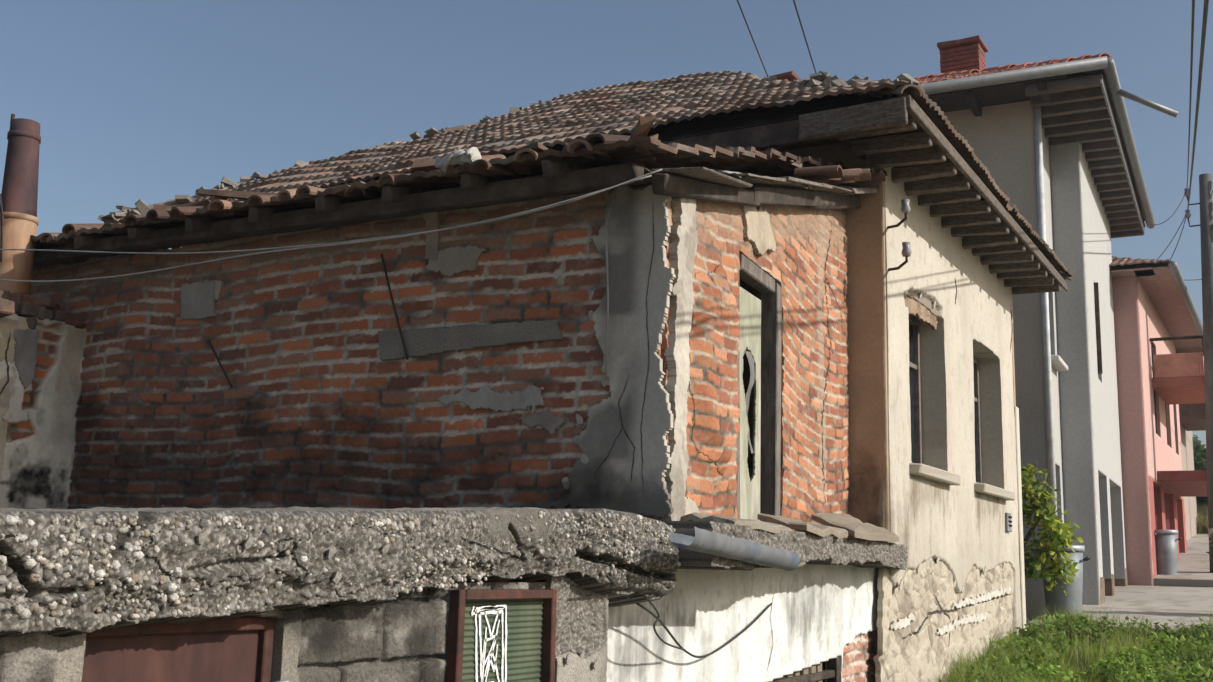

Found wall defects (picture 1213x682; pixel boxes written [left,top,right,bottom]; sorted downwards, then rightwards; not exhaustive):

crack [594,207,654,499]
flaking render [551,184,698,521]
flaking render [2,410,34,451]
crack [0,534,29,562]
flaking render [842,554,1014,682]